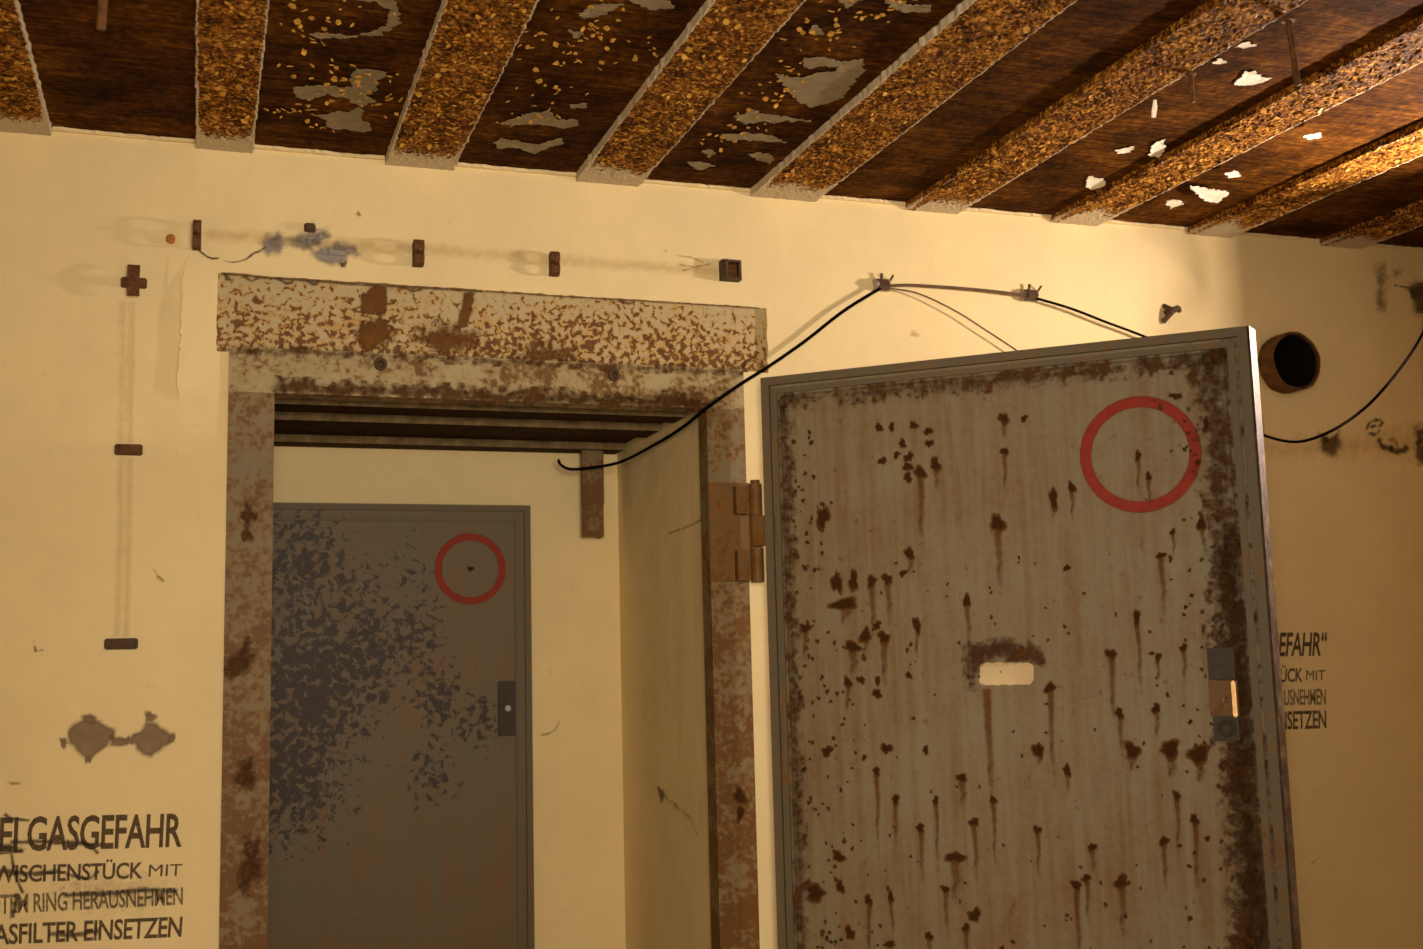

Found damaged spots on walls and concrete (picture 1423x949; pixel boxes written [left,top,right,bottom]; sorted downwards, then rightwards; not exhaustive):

peeling [1234,71,1271,86]
peeling [493,103,587,154]
peeling [687,57,866,170]
peeling [1115,139,1166,158]
peeling [1085,176,1106,190]
peeling [1166,170,1241,209]
rust [244,286,743,414]
rust [240,504,257,541]
rust [224,636,255,679]
rust [778,392,915,949]
rust [827,341,1278,949]
rust [237,839,260,897]